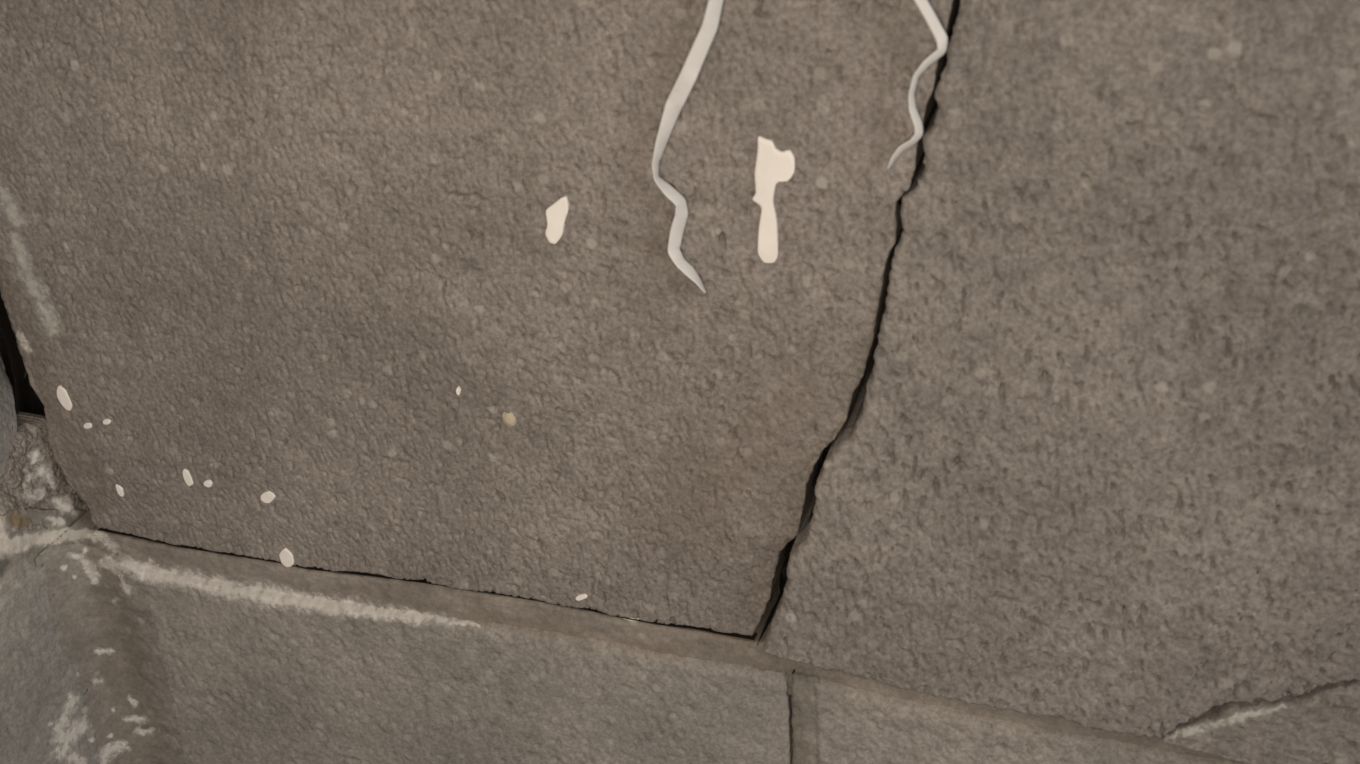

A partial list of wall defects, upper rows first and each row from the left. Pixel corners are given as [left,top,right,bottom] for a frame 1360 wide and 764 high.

peeling [753,136,795,263]
crack [898,151,925,206]
crack [863,339,879,378]
efflorescence [60,534,481,628]
crack [98,442,832,645]
efflorescence [48,693,154,764]